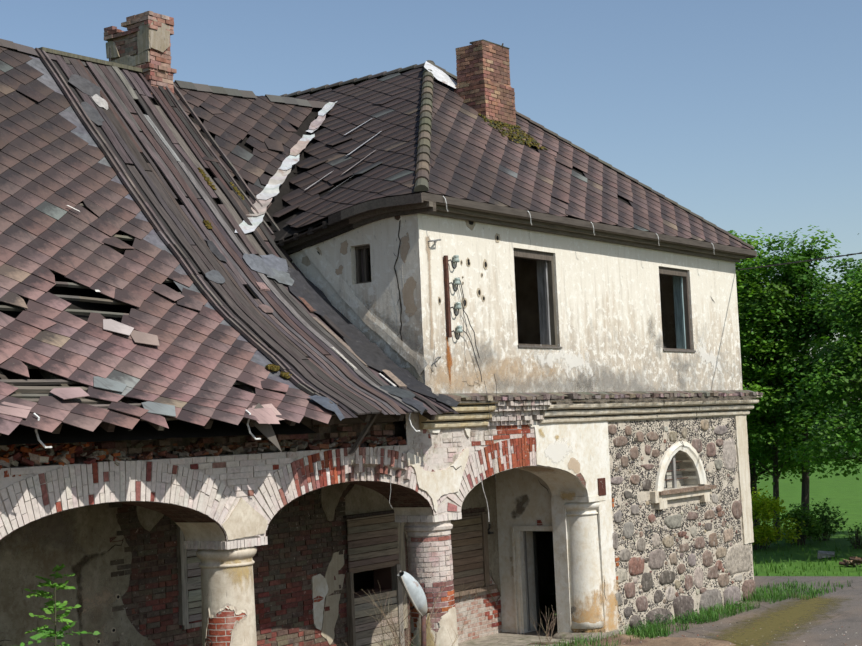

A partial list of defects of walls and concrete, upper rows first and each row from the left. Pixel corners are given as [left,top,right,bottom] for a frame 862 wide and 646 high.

crack [394,221,402,340]
spalling [0,441,240,512]
flaking render [250,434,407,496]
spalling [462,420,544,489]
spalling [205,603,247,646]
spalling [409,568,502,645]